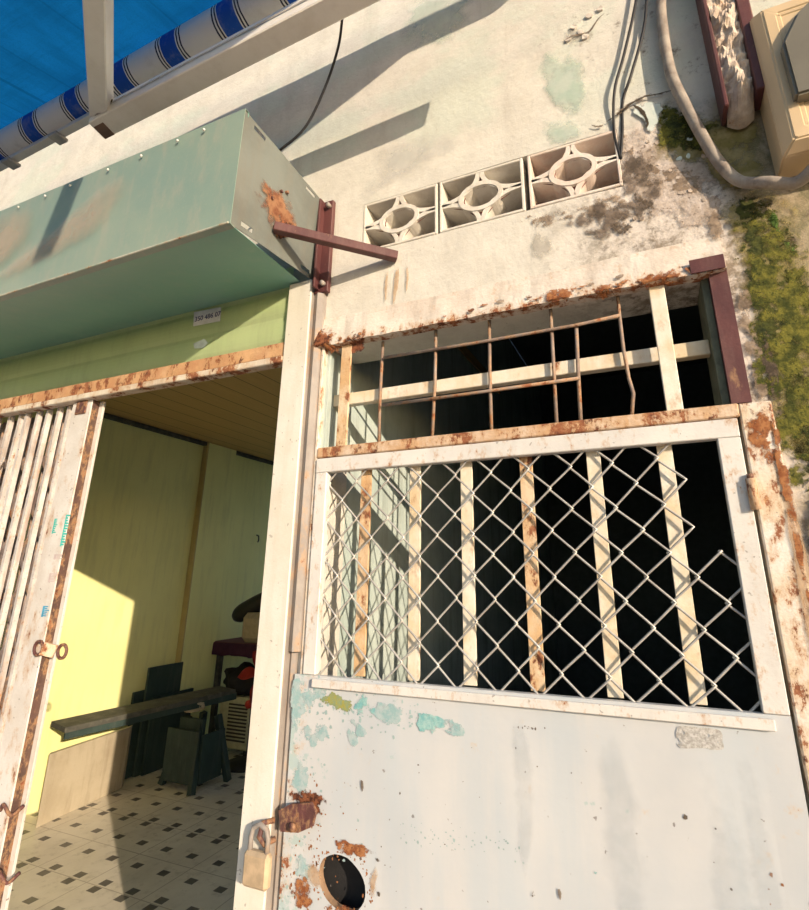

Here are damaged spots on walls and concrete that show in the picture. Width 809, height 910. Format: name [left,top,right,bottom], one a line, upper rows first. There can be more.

leakage [545,59,583,109]
spalling [621,102,726,227]
corrosion [262,181,296,226]
leakage [521,148,700,254]
corrosion [538,288,572,307]
corrosion [638,267,697,288]
corrosion [313,329,364,355]
leakage [738,290,782,416]
corrosion [746,409,809,634]
peeling [290,678,403,747]
peeling [416,713,465,737]
peeling [291,764,309,793]